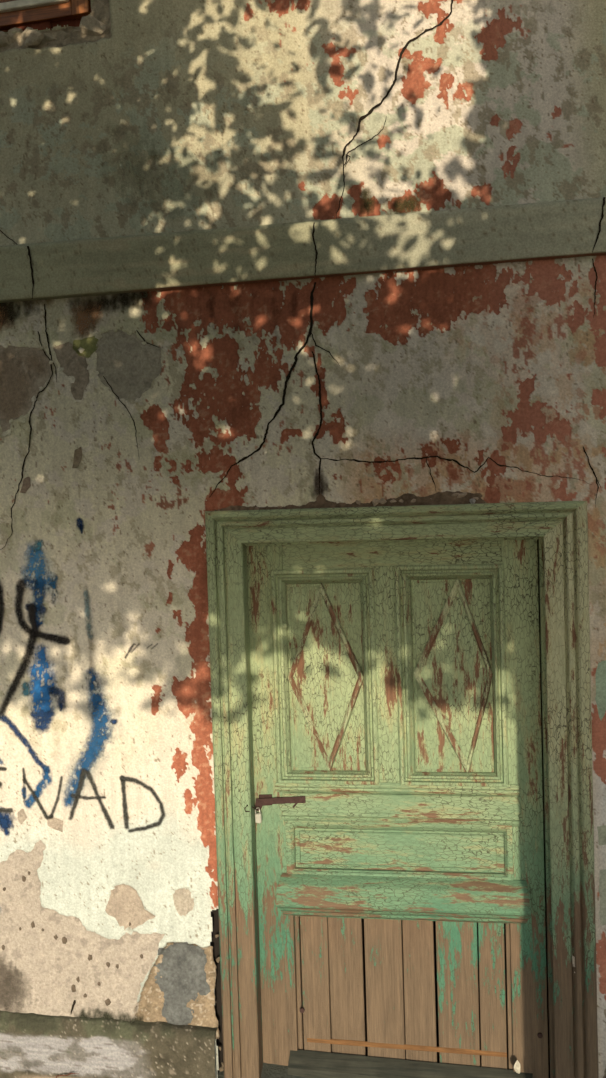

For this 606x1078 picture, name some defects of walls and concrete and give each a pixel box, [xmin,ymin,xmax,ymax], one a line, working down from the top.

peeling [244,3,253,21]
peeling [265,0,310,17]
crack [210,0,602,507]
crack [592,197,605,318]
crack [0,230,57,550]
peeling [0,255,606,511]
peeling [151,524,216,907]
peeling [594,660,606,785]
peeling [0,840,224,1071]